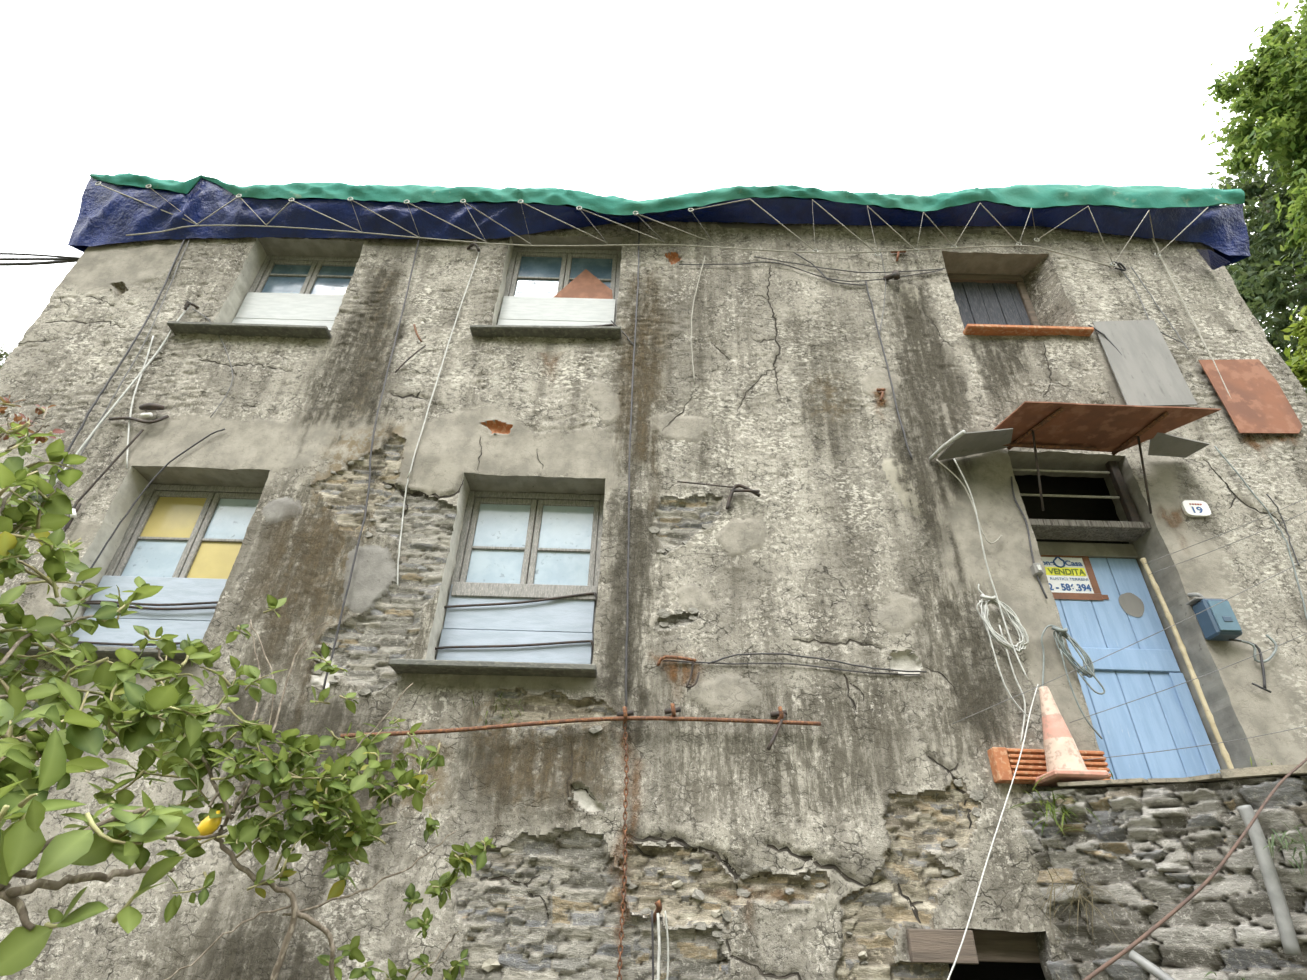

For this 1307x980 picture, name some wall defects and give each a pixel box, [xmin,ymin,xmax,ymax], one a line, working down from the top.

leakage [305,267,405,438]
spalling [310,432,457,696]
spalling [481,420,513,435]
leakage [604,274,660,745]
spalling [648,493,724,555]
crack [714,265,781,412]
leakage [895,286,967,582]
leakage [225,516,394,881]
spalling [445,776,983,980]